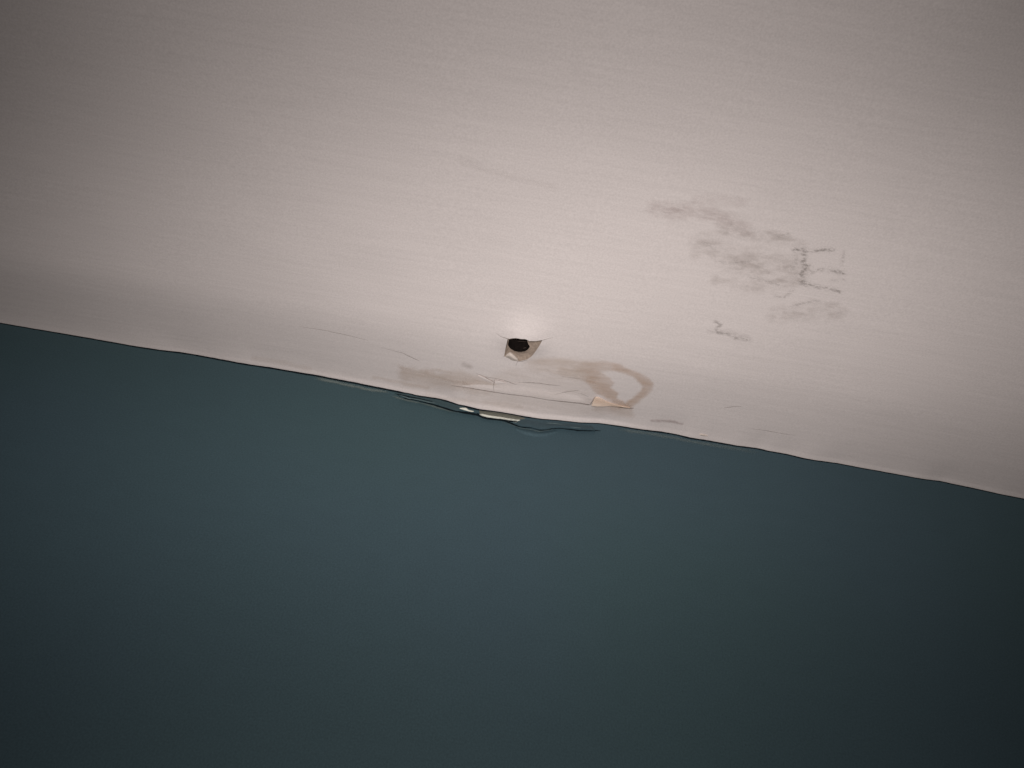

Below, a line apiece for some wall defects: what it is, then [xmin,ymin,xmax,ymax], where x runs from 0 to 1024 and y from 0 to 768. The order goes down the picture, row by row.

hole [508,339,530,352]
peeling [395,393,599,432]